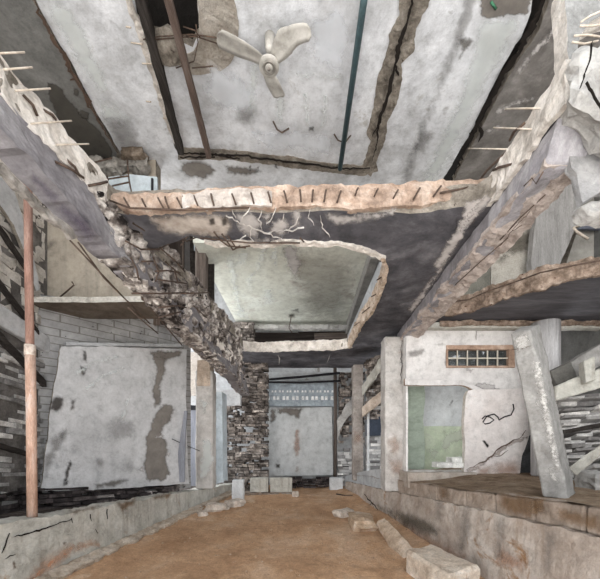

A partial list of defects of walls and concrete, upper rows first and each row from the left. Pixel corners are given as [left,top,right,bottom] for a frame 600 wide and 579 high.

spalling [176,0,239,75]
crack [180,0,414,170]
leakage [182,162,214,179]
leakage [227,167,257,175]
spalling [0,51,600,394]
leakage [144,351,181,481]
crack [468,430,526,469]
spalling [534,362,559,481]
crack [2,518,73,559]